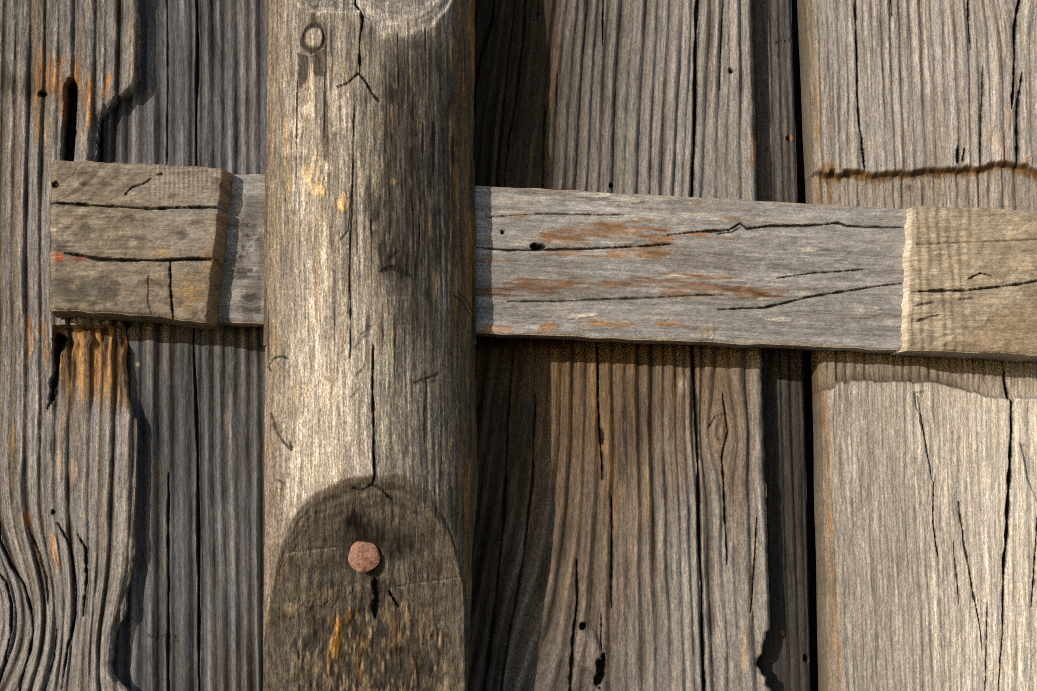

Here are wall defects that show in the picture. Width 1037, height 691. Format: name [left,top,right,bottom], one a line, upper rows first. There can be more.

crack [46,332,65,410]
crack [50,201,226,212]
crack [295,0,392,500]
crack [487,73,625,218]
crack [690,0,725,197]
crack [476,221,1037,252]
crack [507,268,1037,311]
crack [853,0,867,170]
crack [954,0,984,165]
crack [1010,0,1024,169]
crack [0,519,90,691]
crack [917,361,1037,691]